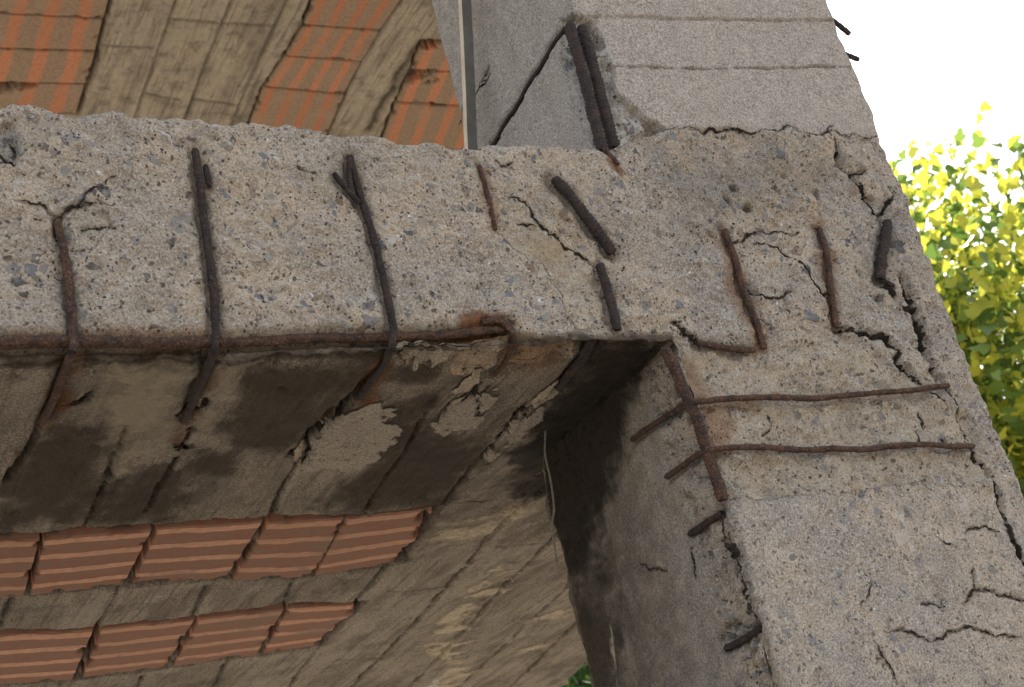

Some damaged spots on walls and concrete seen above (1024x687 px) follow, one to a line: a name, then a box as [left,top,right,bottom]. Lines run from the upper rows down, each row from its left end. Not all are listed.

crack [19,175,117,242]
spalling [490,184,605,330]
crack [510,196,598,281]
crack [657,124,894,232]
rust [443,311,507,343]
damp [0,362,370,534]
peeling [293,403,403,474]
spalling [396,334,574,437]
damp [431,339,674,587]
spalling [682,329,999,501]
damp [528,575,623,687]
crack [872,570,1024,682]